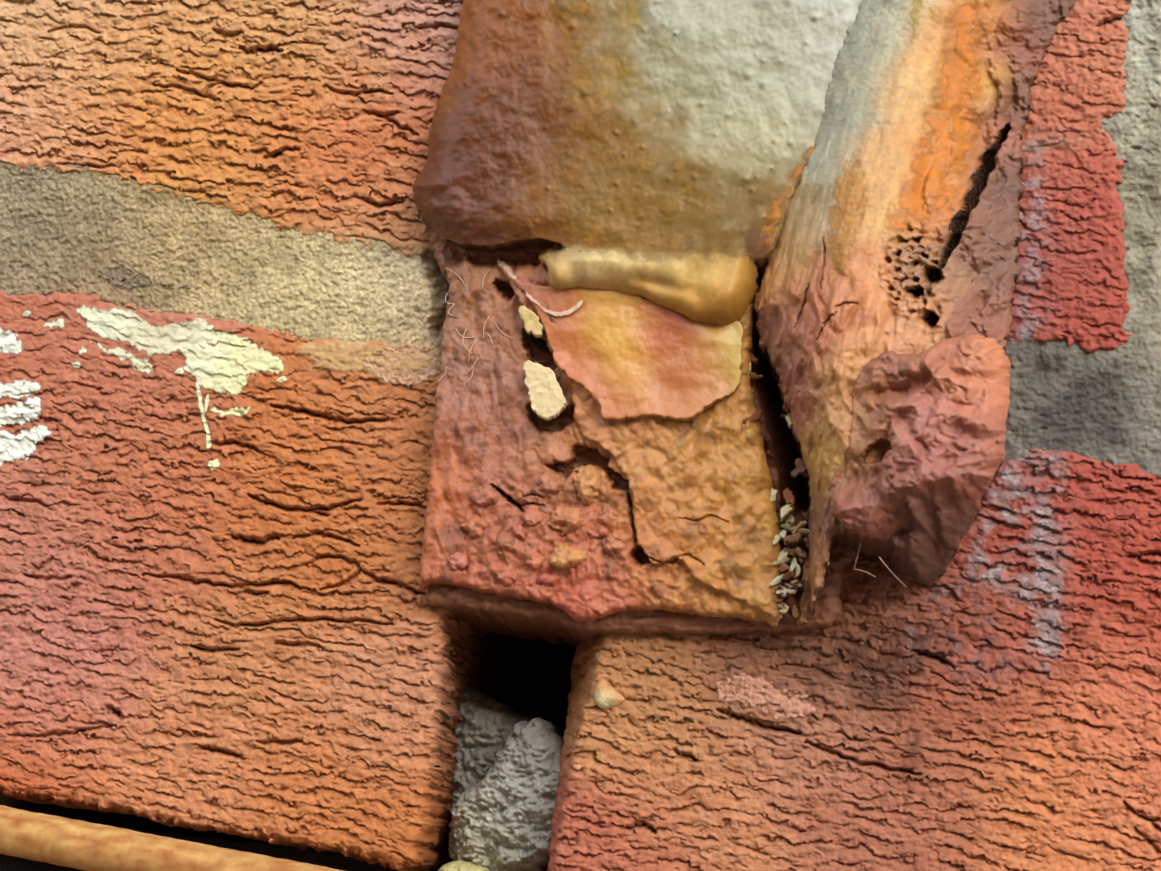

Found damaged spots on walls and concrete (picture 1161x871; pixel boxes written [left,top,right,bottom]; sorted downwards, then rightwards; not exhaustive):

spalling [95,265,152,289]
corrosion [413,0,816,262]
peeling [497,258,770,424]
peeling [780,395,792,429]
corrosion [829,160,867,272]
corrosion [891,0,983,230]
crack [942,127,1011,262]
peeling [768,458,810,623]